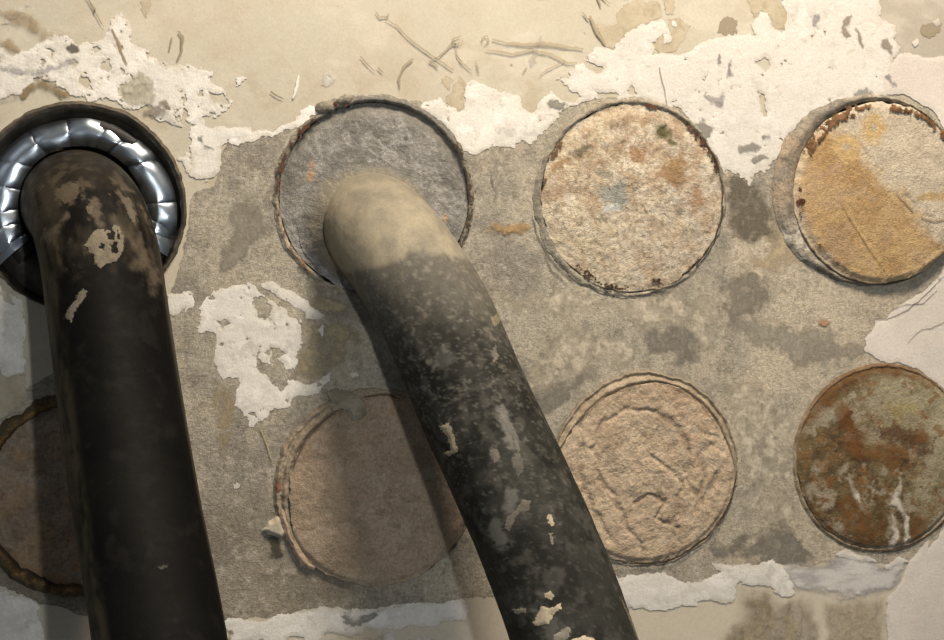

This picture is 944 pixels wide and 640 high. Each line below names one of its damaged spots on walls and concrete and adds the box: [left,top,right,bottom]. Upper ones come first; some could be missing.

crack [88,0,127,65]
crack [376,0,610,88]
rust [802,104,871,158]
rust [889,104,944,140]
flaking render [0,12,494,640]
flaking render [351,0,944,640]
damp [729,597,816,640]
damp [828,600,882,640]